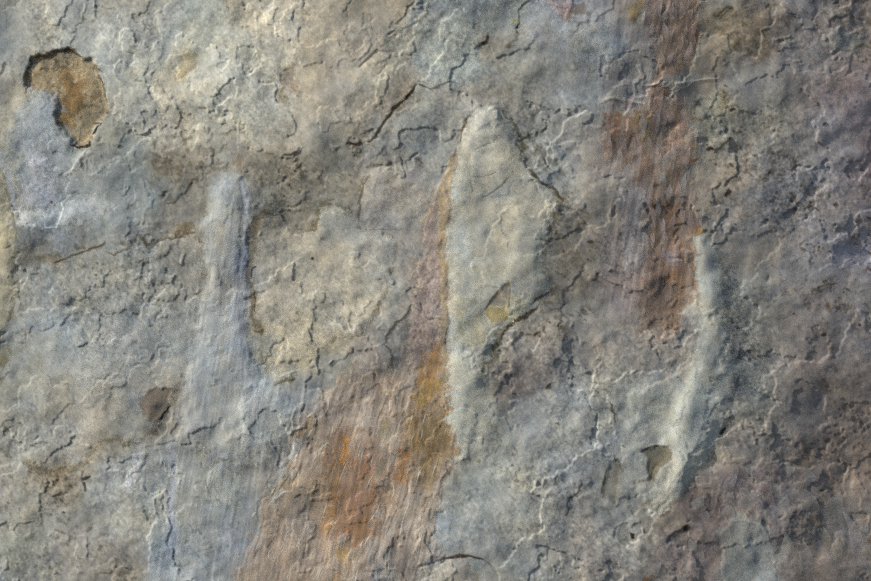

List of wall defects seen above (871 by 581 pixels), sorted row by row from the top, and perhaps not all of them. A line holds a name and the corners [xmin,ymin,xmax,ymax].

crack [358,3,428,67]
flaking render [23,47,108,149]
crack [346,81,460,145]
corrosion [601,0,699,344]
crack [26,227,195,263]
flaking render [486,283,511,322]
crack [383,304,411,366]
corrosion [235,153,459,581]
flaking render [139,387,173,422]
flaking render [601,458,623,505]
flaking render [641,445,671,481]
crack [441,554,483,563]